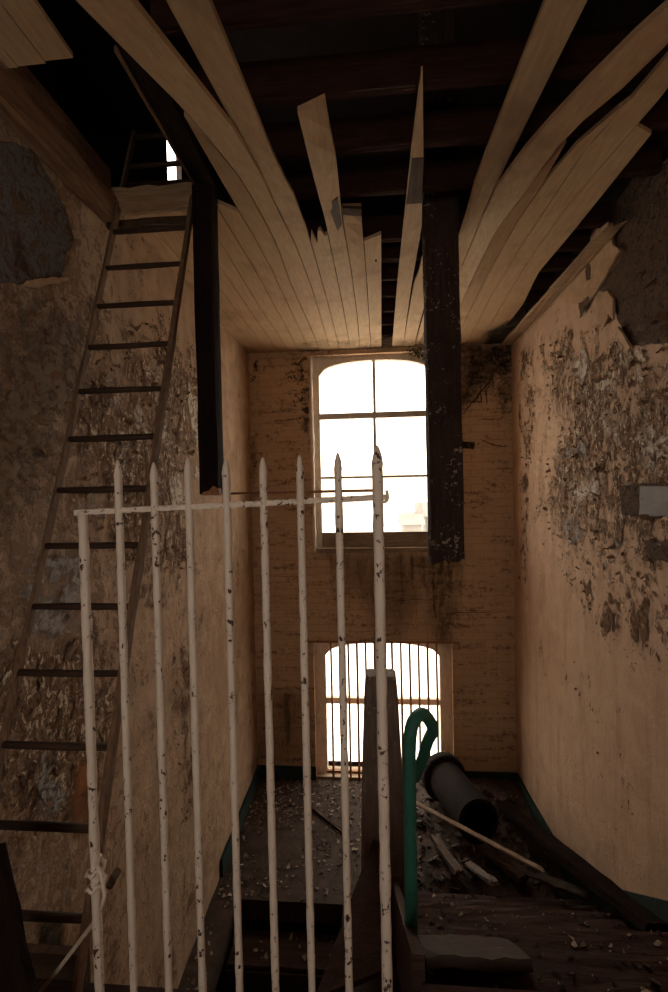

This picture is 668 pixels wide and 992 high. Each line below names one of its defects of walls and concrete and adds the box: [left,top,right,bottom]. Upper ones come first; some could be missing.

spalling [0,141,73,288]
peeling [69,307,200,624]
spalling [518,158,668,674]
peeling [0,552,119,851]
peeling [171,640,203,824]